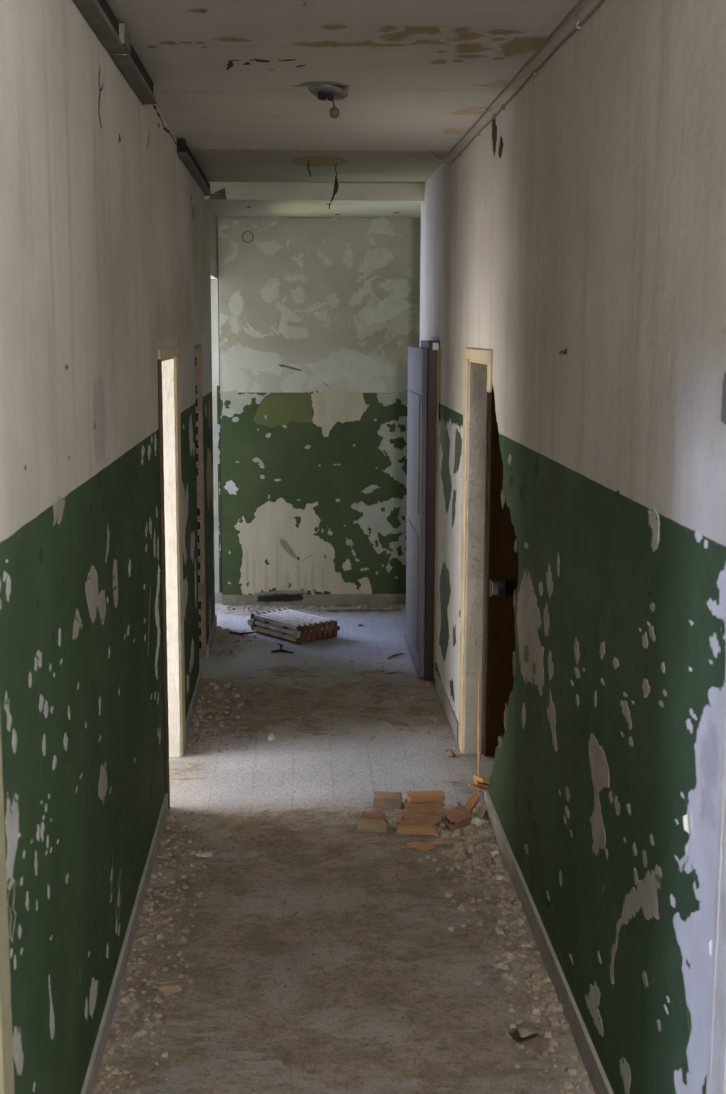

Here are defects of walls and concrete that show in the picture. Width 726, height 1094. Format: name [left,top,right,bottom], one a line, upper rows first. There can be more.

crack [225,59,305,70]
damp [284,22,557,65]
peeling [58,531,131,646]
peeling [124,506,160,705]
peeling [182,344,408,752]
peeling [436,414,463,722]
peeling [512,553,560,751]
peeling [707,563,726,664]
peeling [708,681,725,721]
peeling [5,791,59,970]
peeling [588,733,631,859]
peeling [597,708,717,1094]